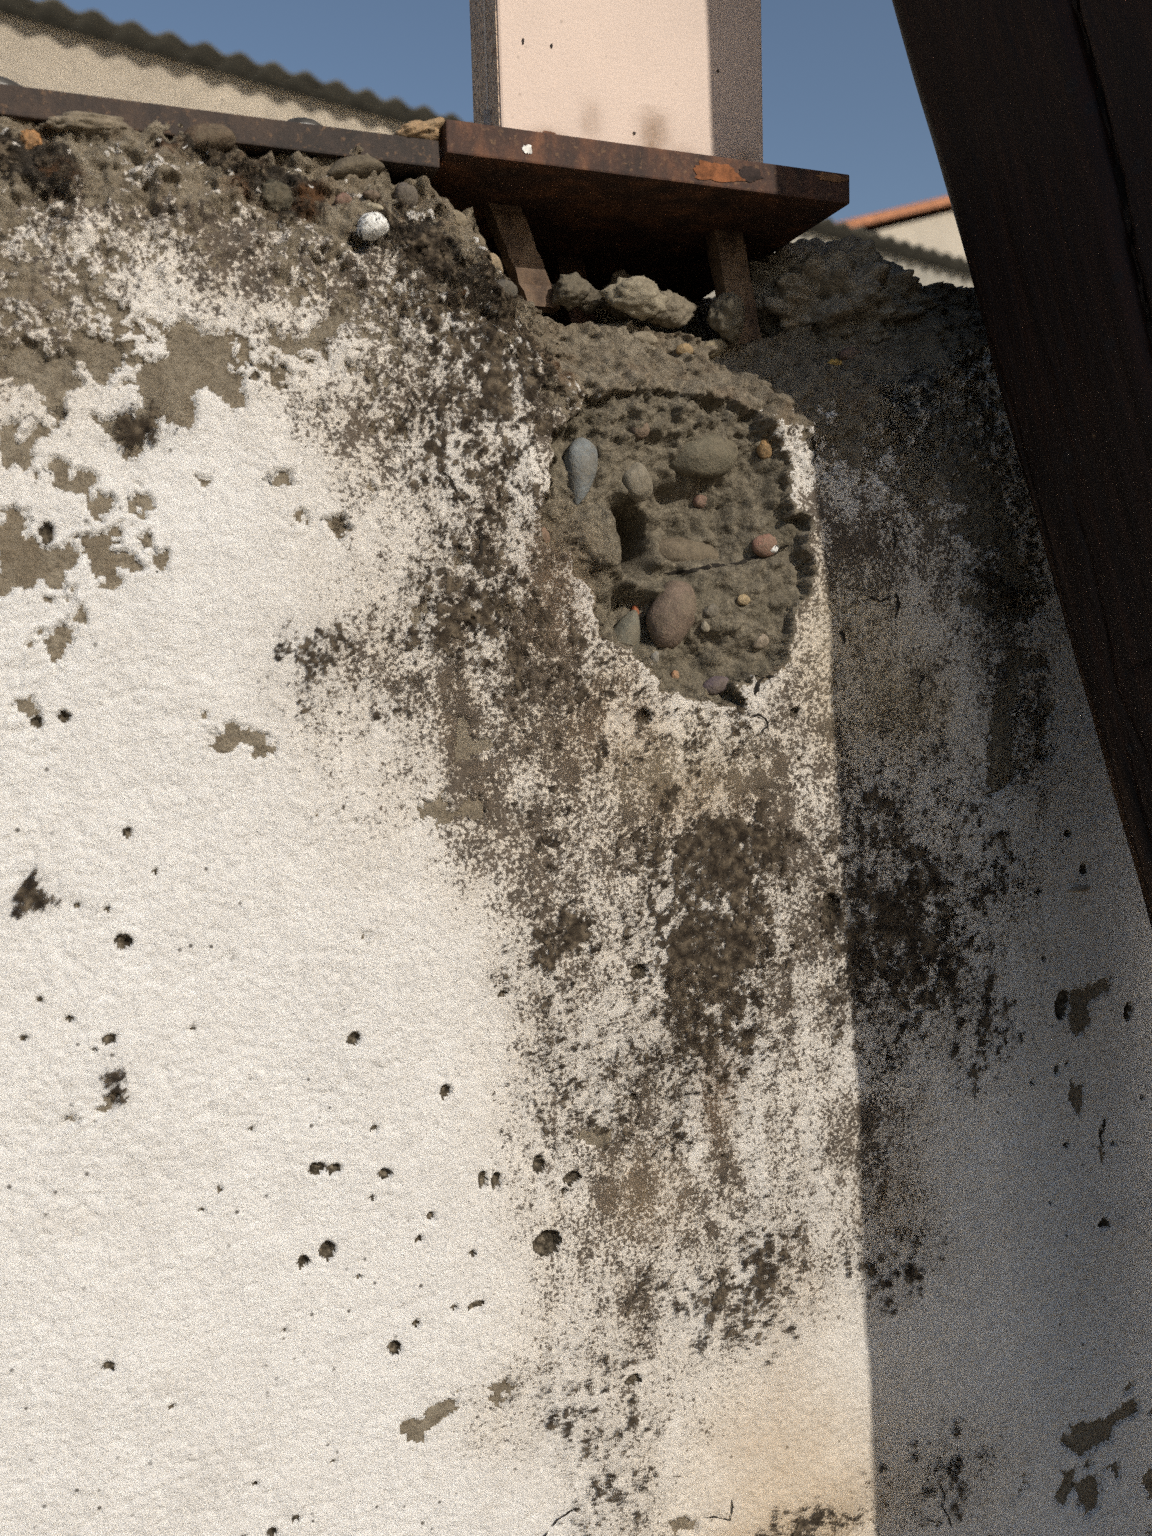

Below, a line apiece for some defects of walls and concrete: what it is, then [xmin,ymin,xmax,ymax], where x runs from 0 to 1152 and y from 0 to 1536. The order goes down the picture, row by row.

leakage [0,128,102,221]
leakage [185,136,320,230]
rust [693,160,763,183]
rust [816,172,848,183]
leakage [100,390,192,462]
peeling [0,318,245,663]
spalling [541,387,813,708]
peeling [209,722,276,759]
leakage [258,188,1047,1536]
peeling [1054,978,1111,1037]
peeling [400,1390,460,1443]
peeling [1054,1382,1152,1513]